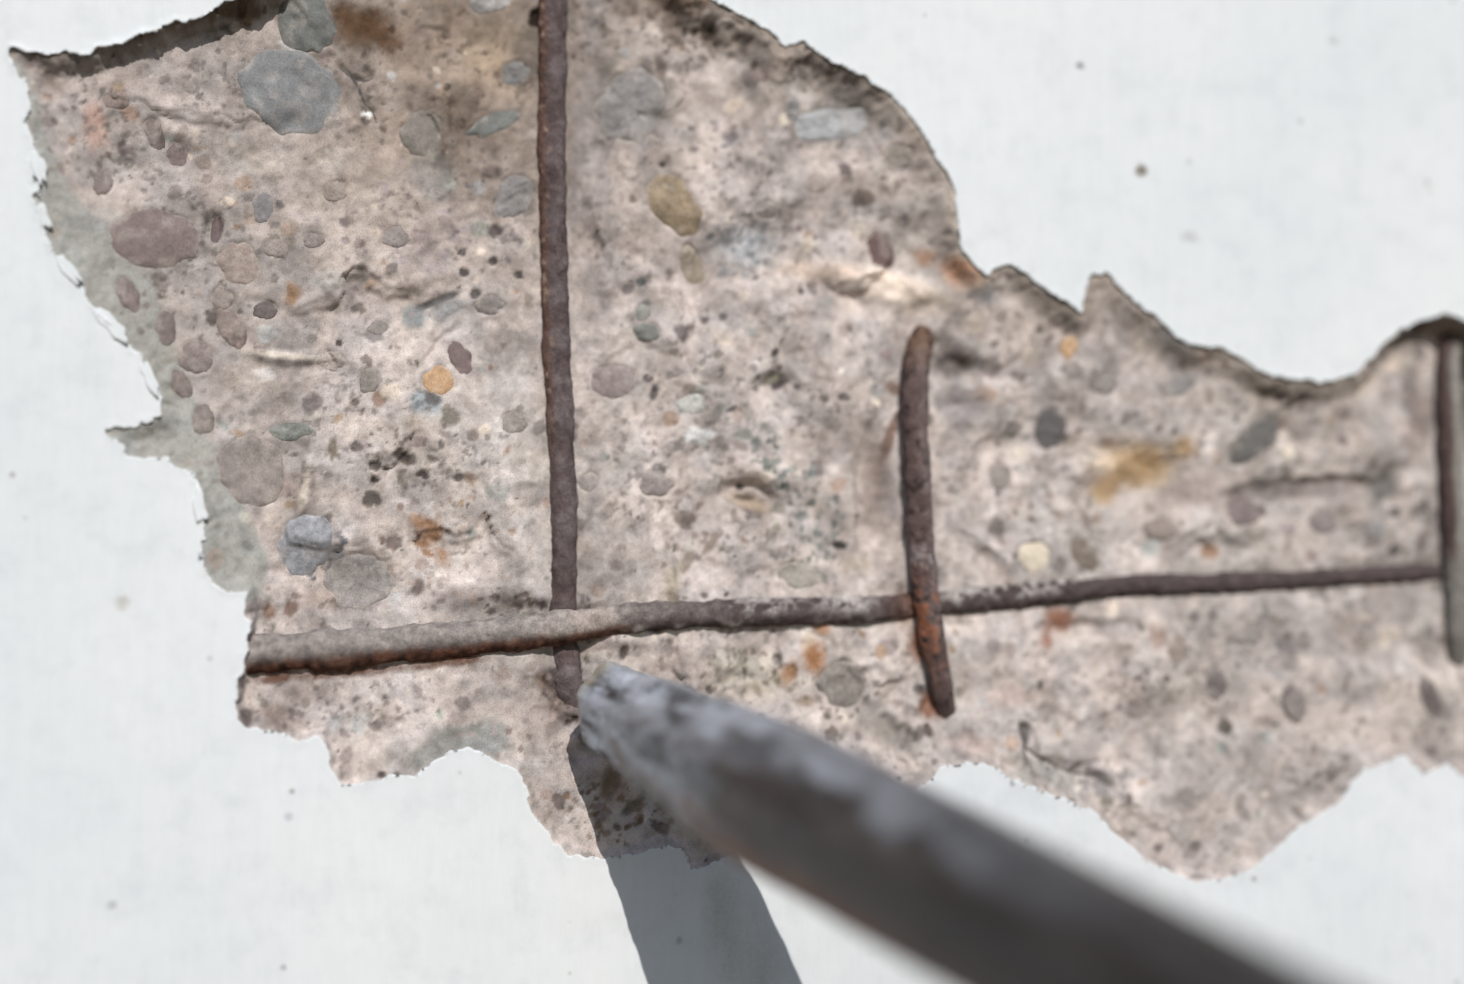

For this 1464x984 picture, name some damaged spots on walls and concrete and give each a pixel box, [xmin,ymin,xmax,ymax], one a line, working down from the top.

spalling [9,0,916,869]
spalling [565,0,1464,883]
rust [263,674,289,683]
rust [314,657,478,677]
rust [783,625,827,680]
rust [912,628,924,660]